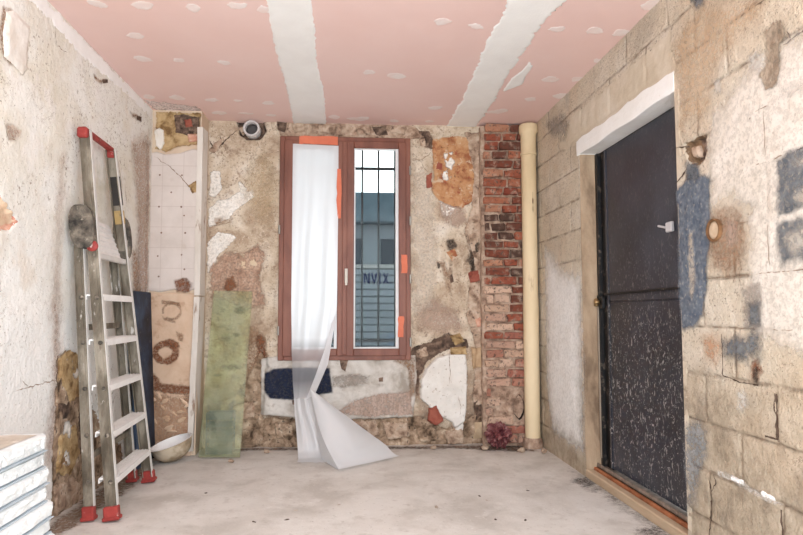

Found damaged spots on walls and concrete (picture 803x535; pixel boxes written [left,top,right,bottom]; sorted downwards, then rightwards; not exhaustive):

peeling [0,8,30,74]
spalling [237,122,267,140]
spalling [0,197,18,231]
spalling [207,171,265,309]
spalling [277,122,482,445]
peeling [673,22,803,350]
spalling [207,349,297,448]
crack [708,474,716,535]